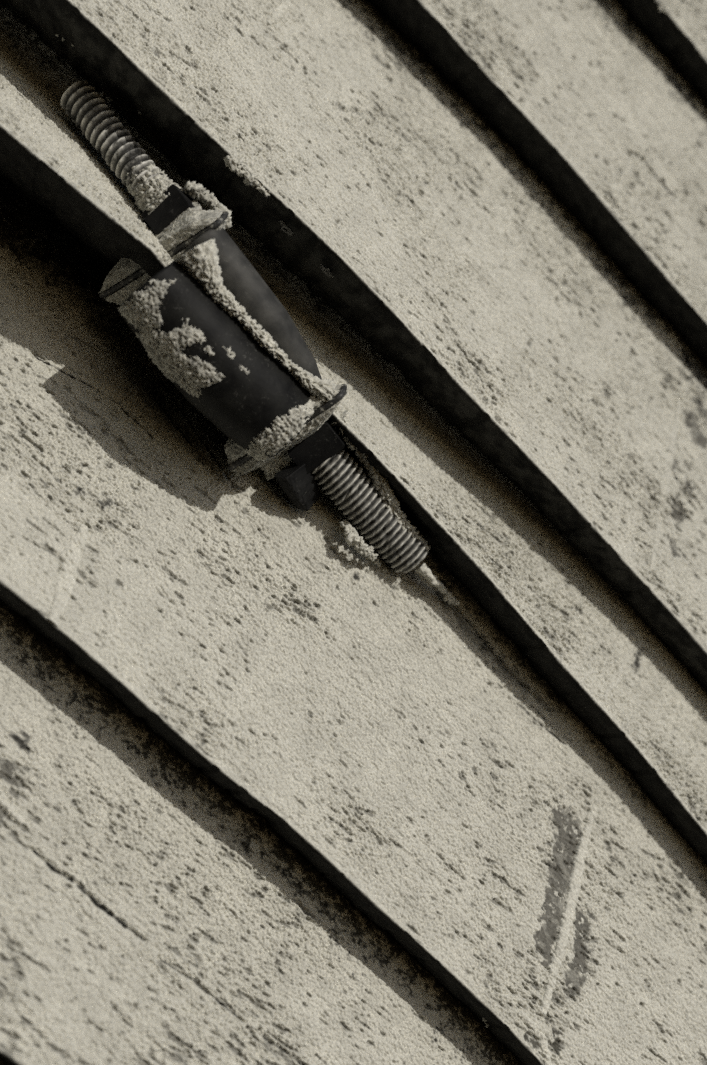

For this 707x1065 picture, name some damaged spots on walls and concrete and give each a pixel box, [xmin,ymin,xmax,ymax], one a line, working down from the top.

peeling [118,279,250,398]
peeling [242,399,315,461]